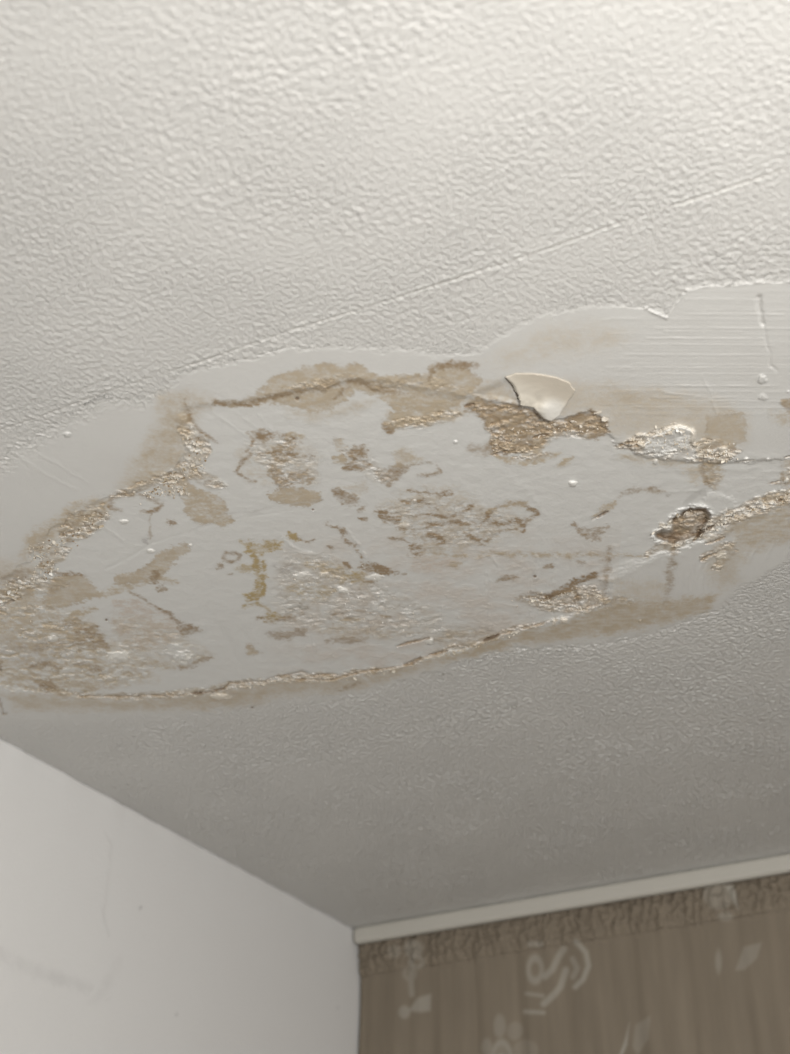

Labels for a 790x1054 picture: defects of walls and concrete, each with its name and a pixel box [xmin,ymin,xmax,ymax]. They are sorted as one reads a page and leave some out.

damp [0,315,790,716]
spalling [0,373,790,701]